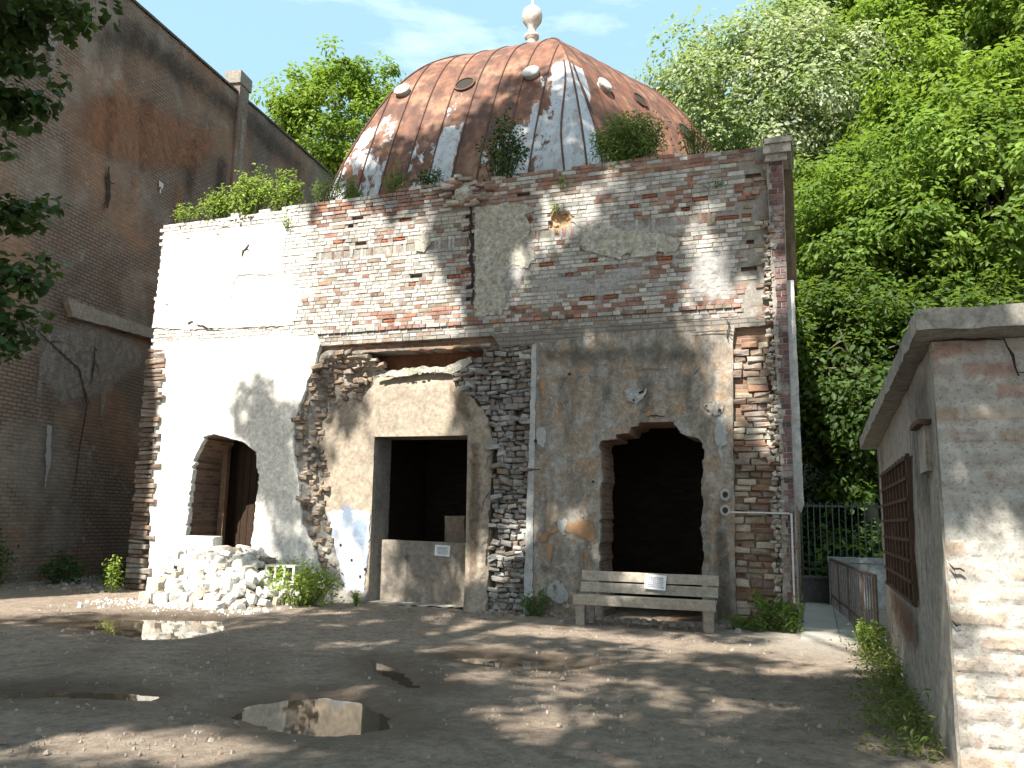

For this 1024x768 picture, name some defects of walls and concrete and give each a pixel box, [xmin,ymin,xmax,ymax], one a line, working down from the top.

flaking render [381,232,431,252]
crack [462,206,475,305]
flaking render [448,203,680,318]
crack [942,337,1024,376]
spalling [291,343,596,613]